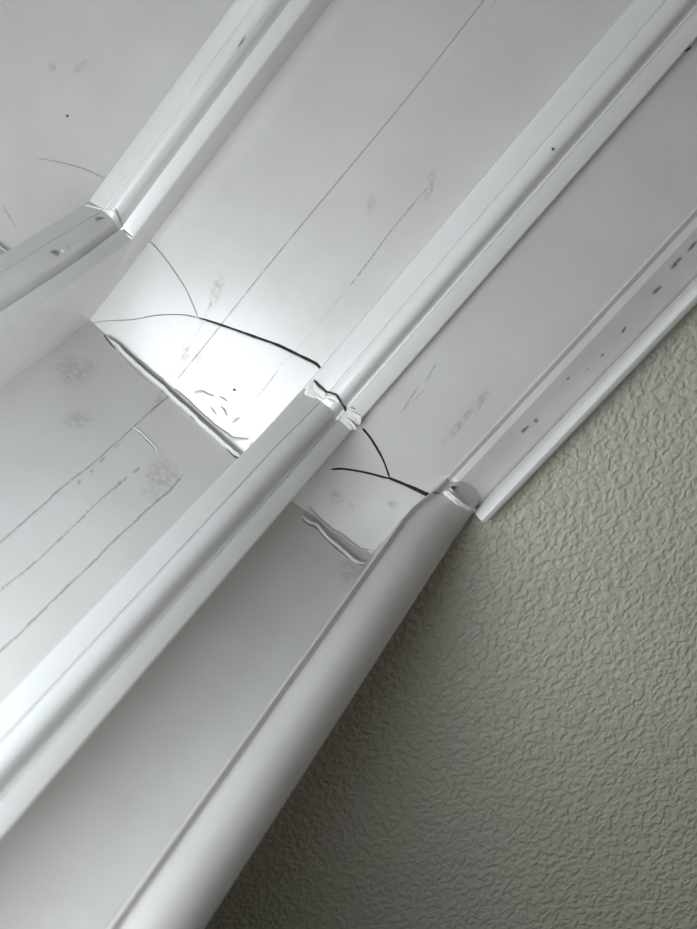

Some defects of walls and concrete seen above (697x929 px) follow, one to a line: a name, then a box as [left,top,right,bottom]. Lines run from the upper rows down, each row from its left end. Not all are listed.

crack [84,205,441,497]